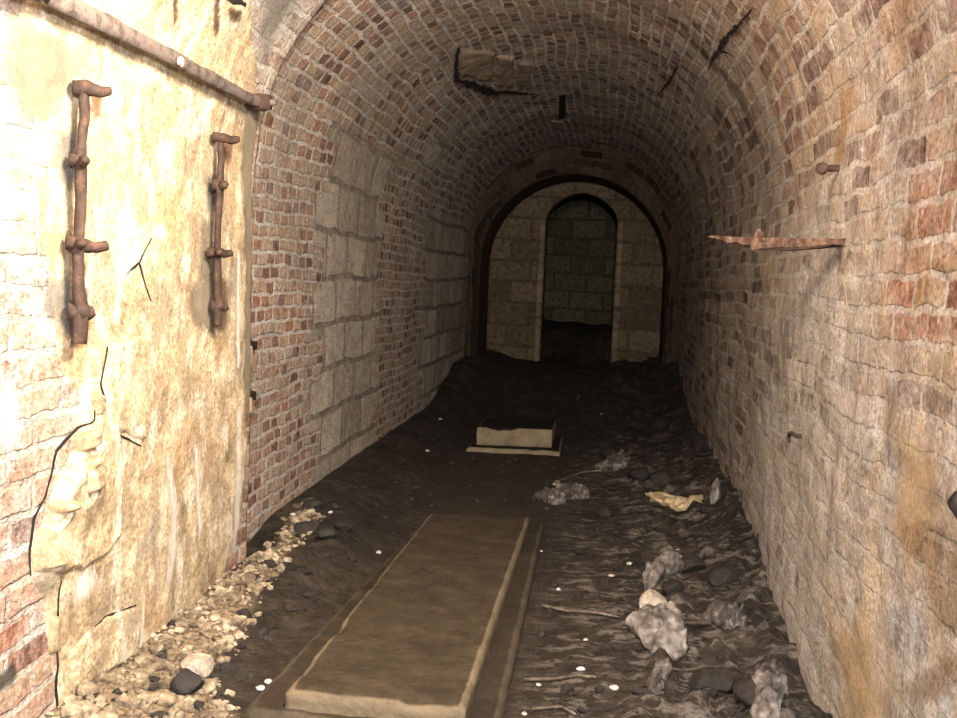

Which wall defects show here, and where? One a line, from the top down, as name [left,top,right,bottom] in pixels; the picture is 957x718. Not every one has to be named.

water stain [263,0,290,33]
rust [224,144,232,162]
crack [122,233,155,301]
rust [707,229,846,251]
flaking render [28,391,123,576]
crack [48,580,62,708]